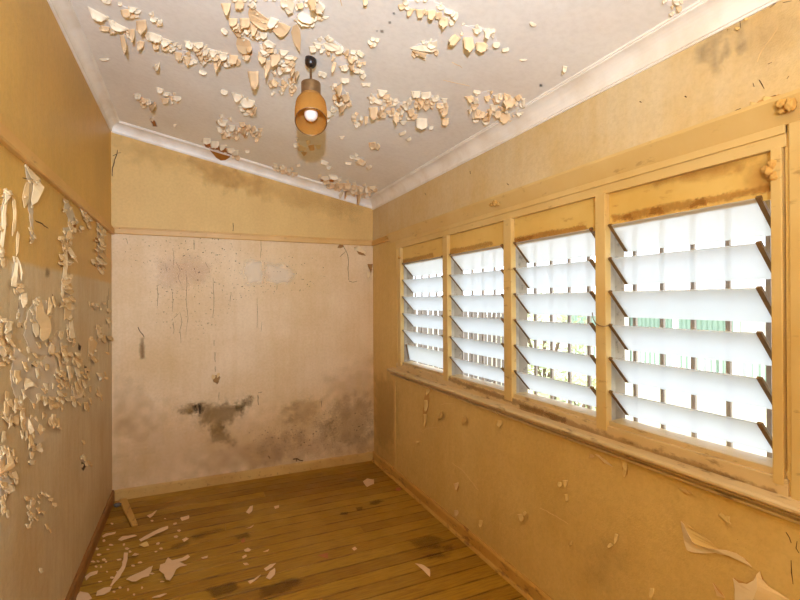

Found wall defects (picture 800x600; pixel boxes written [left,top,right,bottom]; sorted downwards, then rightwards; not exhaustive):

peeling [398,0,509,53]
peeling [88,0,449,161]
peeling [464,90,526,125]
peeling [272,138,321,177]
peeling [318,160,377,205]
peeling [0,164,113,518]
peeling [24,491,57,534]
peeling [681,521,789,600]